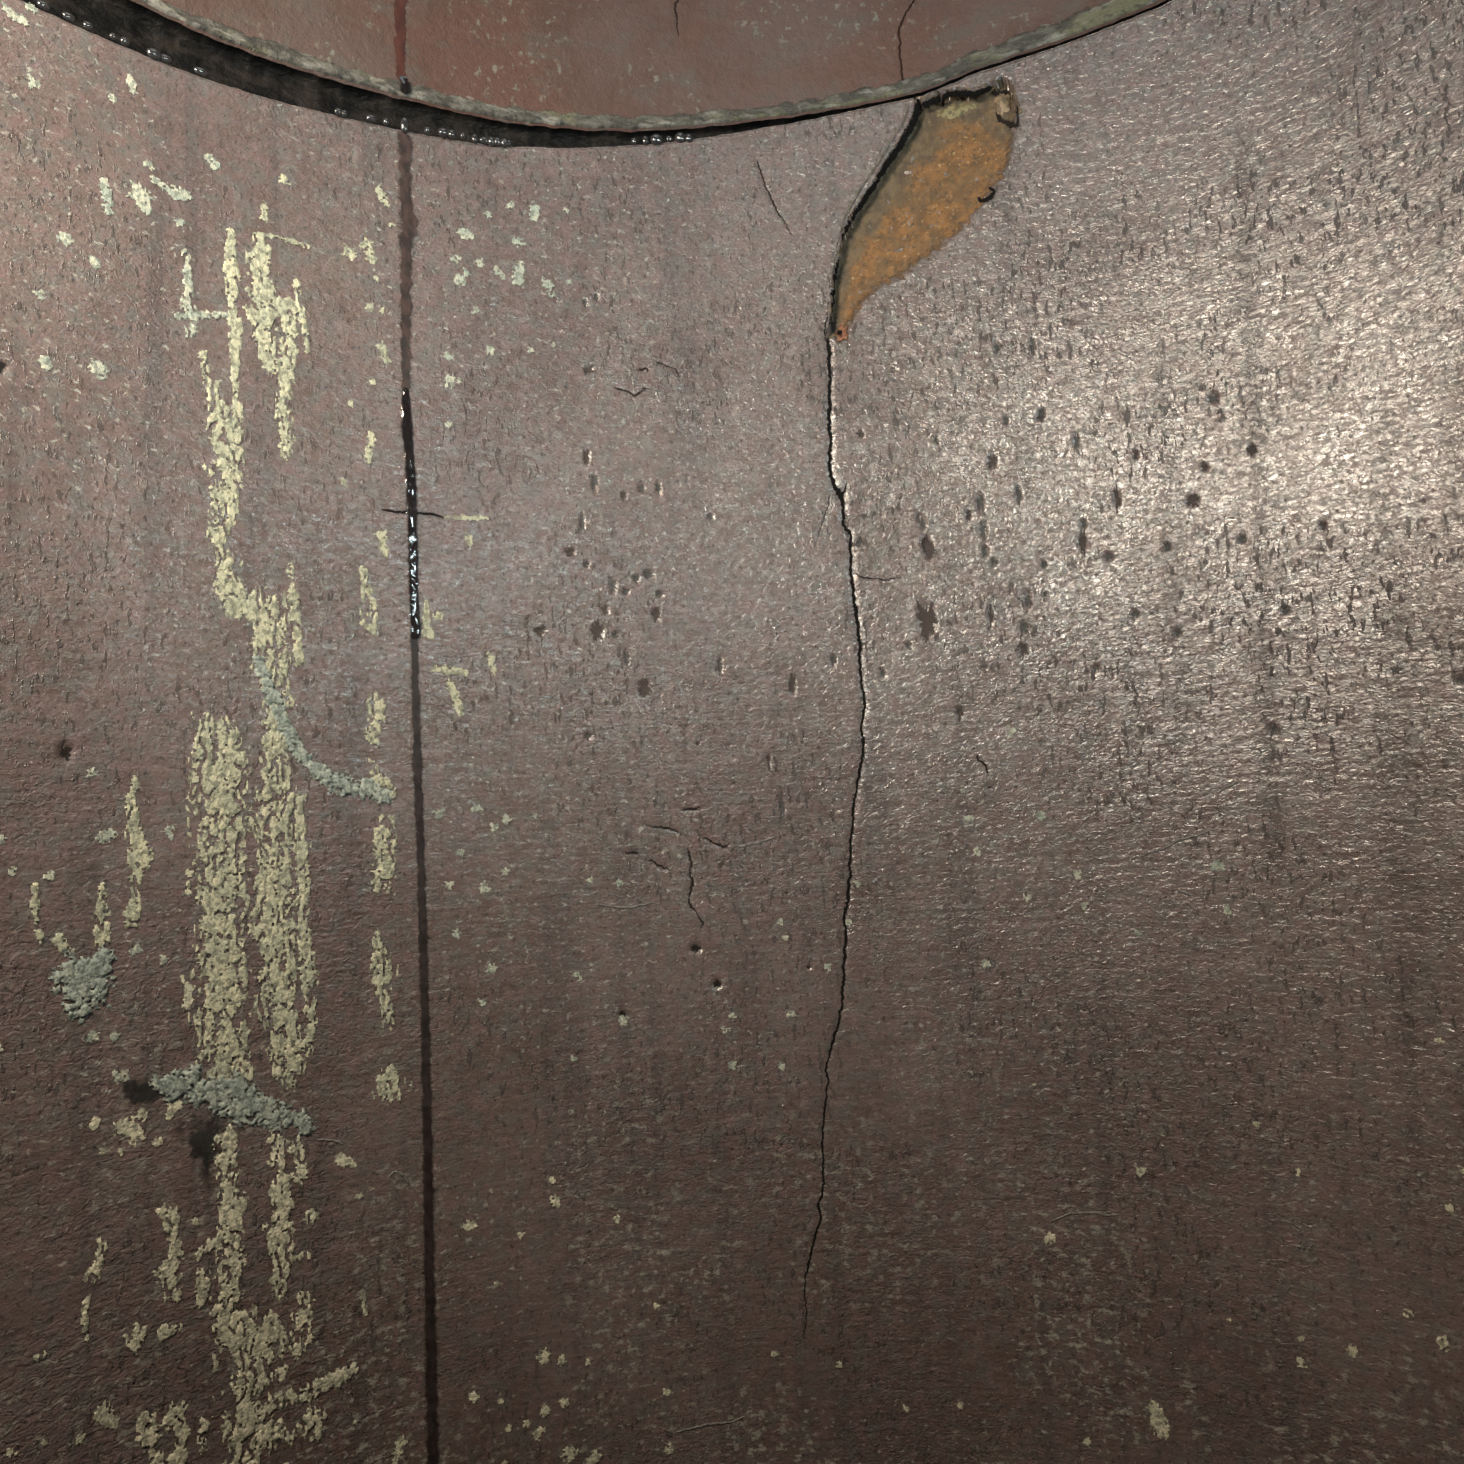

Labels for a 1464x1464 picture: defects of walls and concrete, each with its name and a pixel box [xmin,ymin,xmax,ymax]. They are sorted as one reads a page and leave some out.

crack [672,0,680,36]
crack [897,0,914,80]
spalling [824,78,1022,341]
damp [174,227,320,1093]
damp [93,775,155,948]
crack [804,322,899,1330]
damp [29,883,75,955]
damp [123,1079,161,1103]
damp [80,1237,108,1342]
damp [123,1322,183,1356]
damp [135,1114,359,1464]